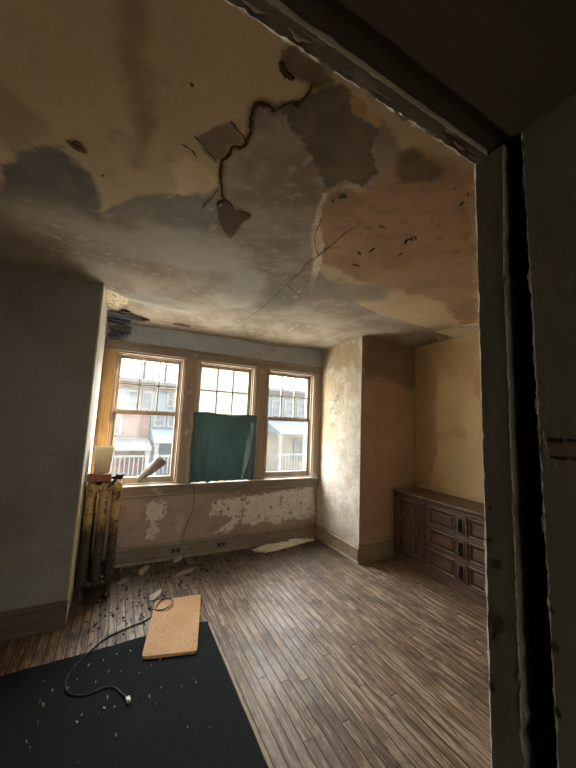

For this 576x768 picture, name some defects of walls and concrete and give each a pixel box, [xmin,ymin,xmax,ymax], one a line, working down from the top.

crack [181,61,315,210]
leakage [276,44,383,189]
leakage [0,140,272,280]
peeling [0,66,479,458]
crack [245,218,360,321]
peeling [143,498,186,543]
peeling [207,486,317,535]
leakage [320,334,480,542]